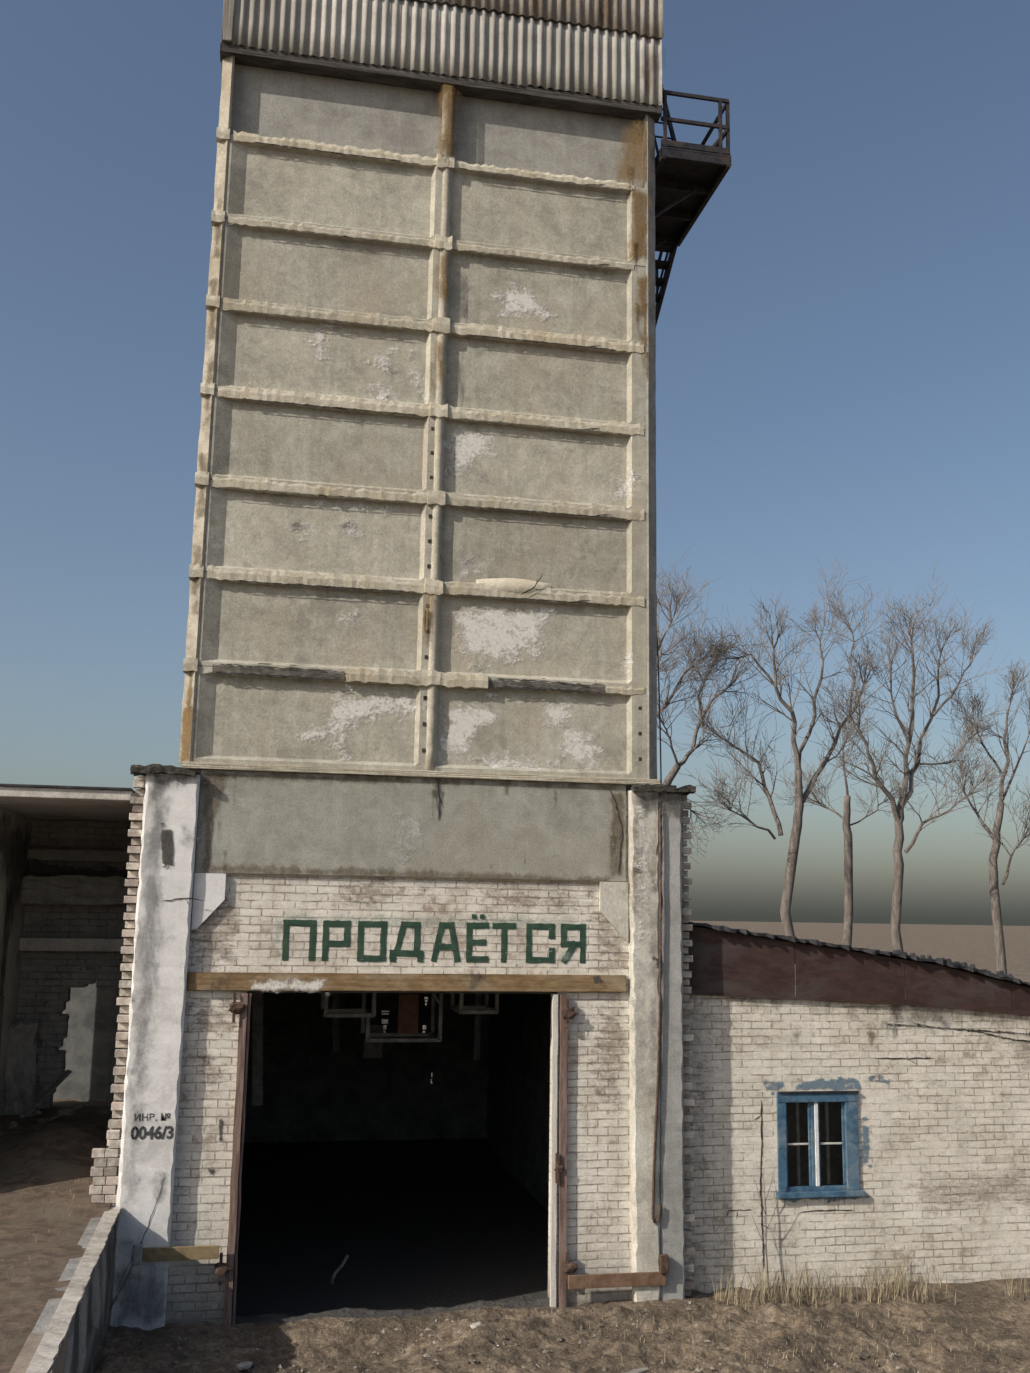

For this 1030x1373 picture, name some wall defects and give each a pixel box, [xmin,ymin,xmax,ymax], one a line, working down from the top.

corrosion [617,121,650,377]
peeling [453,604,555,670]
peeling [296,684,603,771]
crack [875,1023,1030,1064]